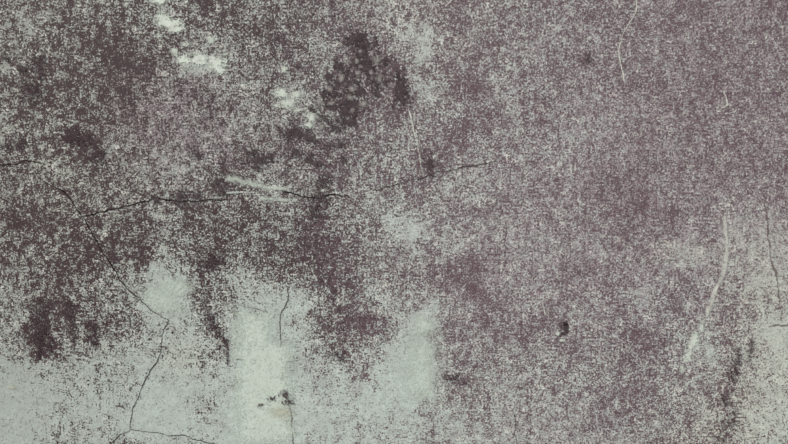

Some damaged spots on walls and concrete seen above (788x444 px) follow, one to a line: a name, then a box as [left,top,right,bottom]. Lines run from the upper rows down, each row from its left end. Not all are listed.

crack [0,160,225,444]
peeling [233,307,297,444]
crack [248,286,298,444]
crack [272,189,351,199]
crack [373,161,497,191]
crack [763,194,788,327]